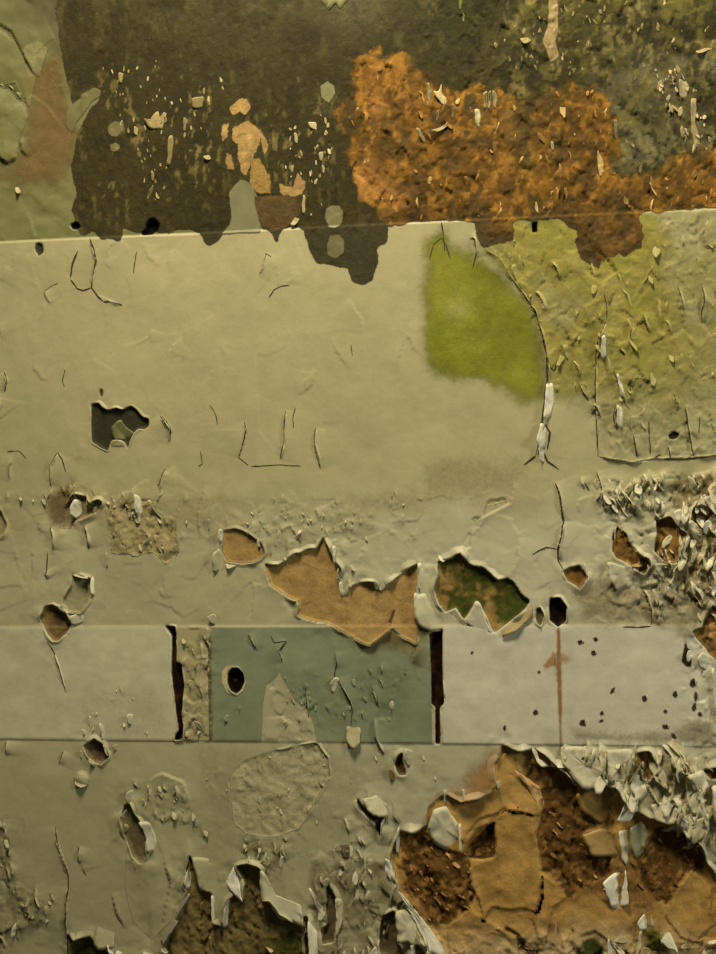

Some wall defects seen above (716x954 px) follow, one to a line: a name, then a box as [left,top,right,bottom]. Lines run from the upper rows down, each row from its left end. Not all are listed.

leakage [12,0,716,285]
corrosion [334,45,716,261]
crack [44,239,122,307]
peeling [89,389,151,453]
peeling [537,383,554,463]
peeling [0,484,190,568]
peeling [36,572,96,645]
peeling [208,498,595,648]
spalling [80,712,118,769]
peeling [117,782,208,869]
peeling [138,725,716,954]
peeling [68,926,122,954]